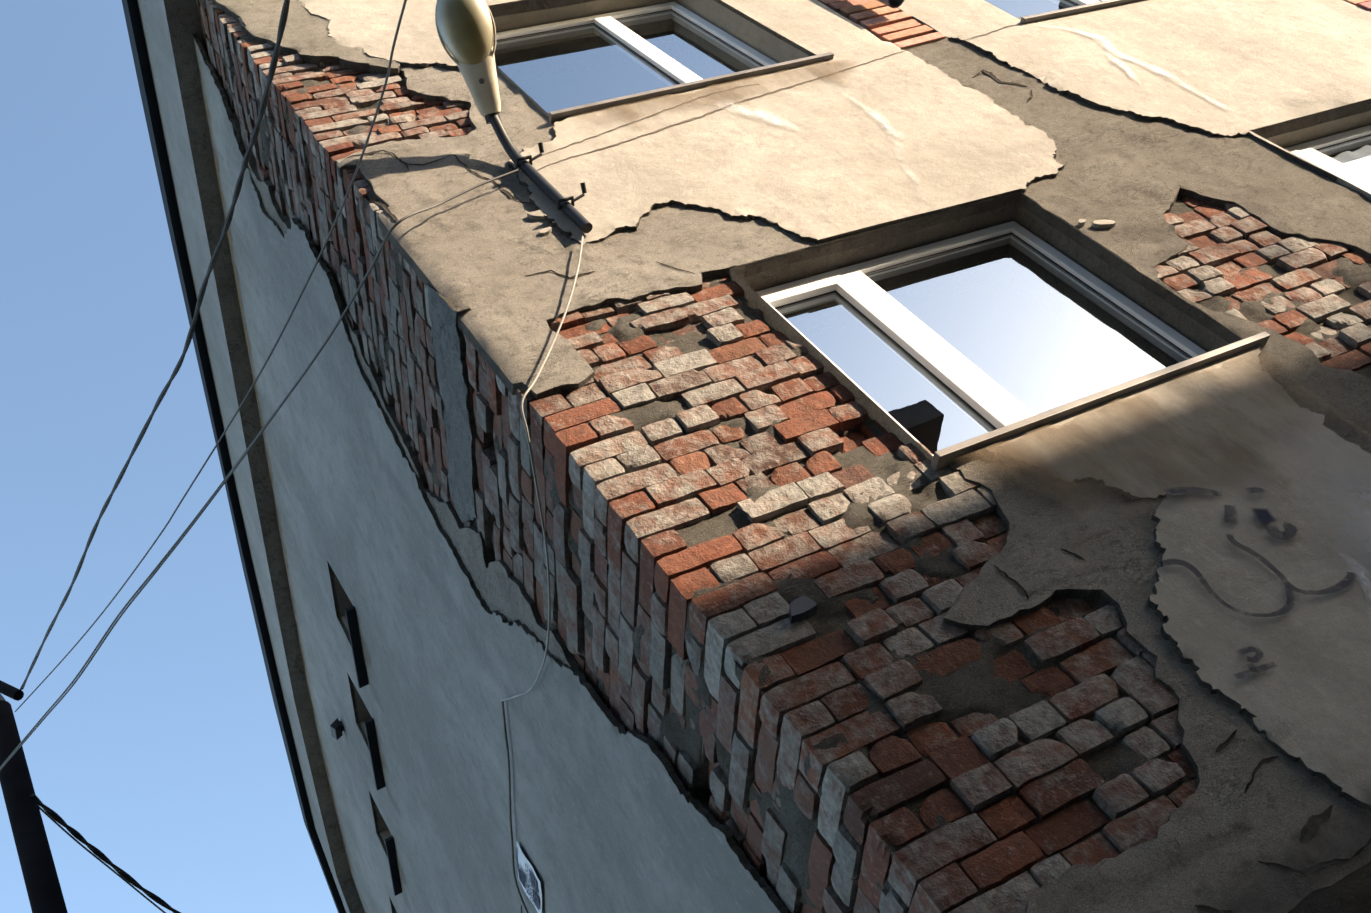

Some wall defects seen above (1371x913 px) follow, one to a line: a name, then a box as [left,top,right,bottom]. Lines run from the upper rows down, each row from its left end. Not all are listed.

flaking render [196,0,1197,913]
flaking render [904,37,1371,454]
flaking render [943,454,1371,913]